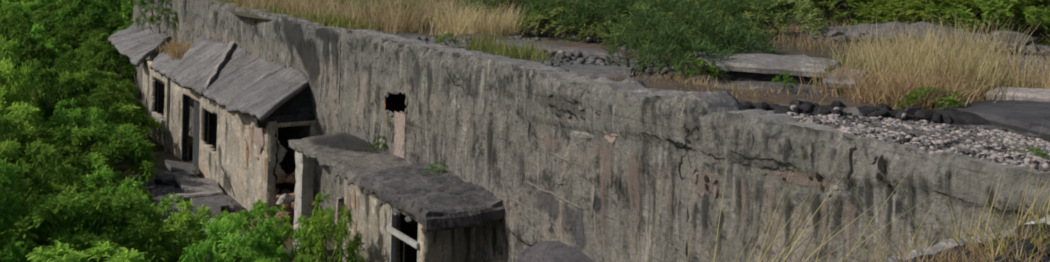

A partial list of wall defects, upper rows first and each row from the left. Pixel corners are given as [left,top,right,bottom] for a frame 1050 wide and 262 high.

water stain [273,15,379,108]
water stain [414,61,431,104]
crack [643,126,812,180]
water stain [537,185,595,249]
water stain [692,196,723,257]